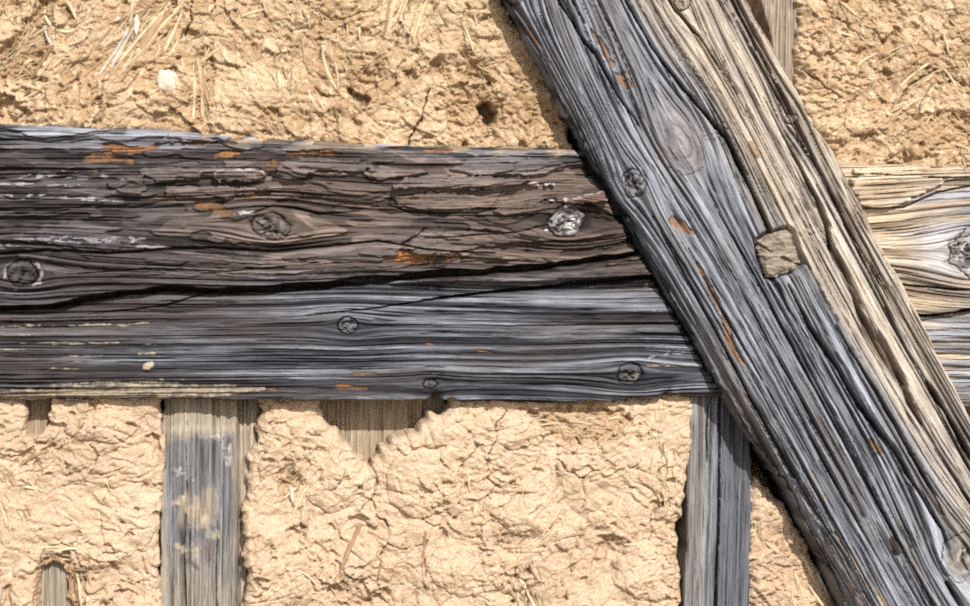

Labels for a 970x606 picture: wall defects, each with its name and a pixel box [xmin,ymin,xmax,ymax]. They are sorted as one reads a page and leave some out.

crack [408,90,429,145]
crack [0,205,652,315]
spalling [32,551,84,606]